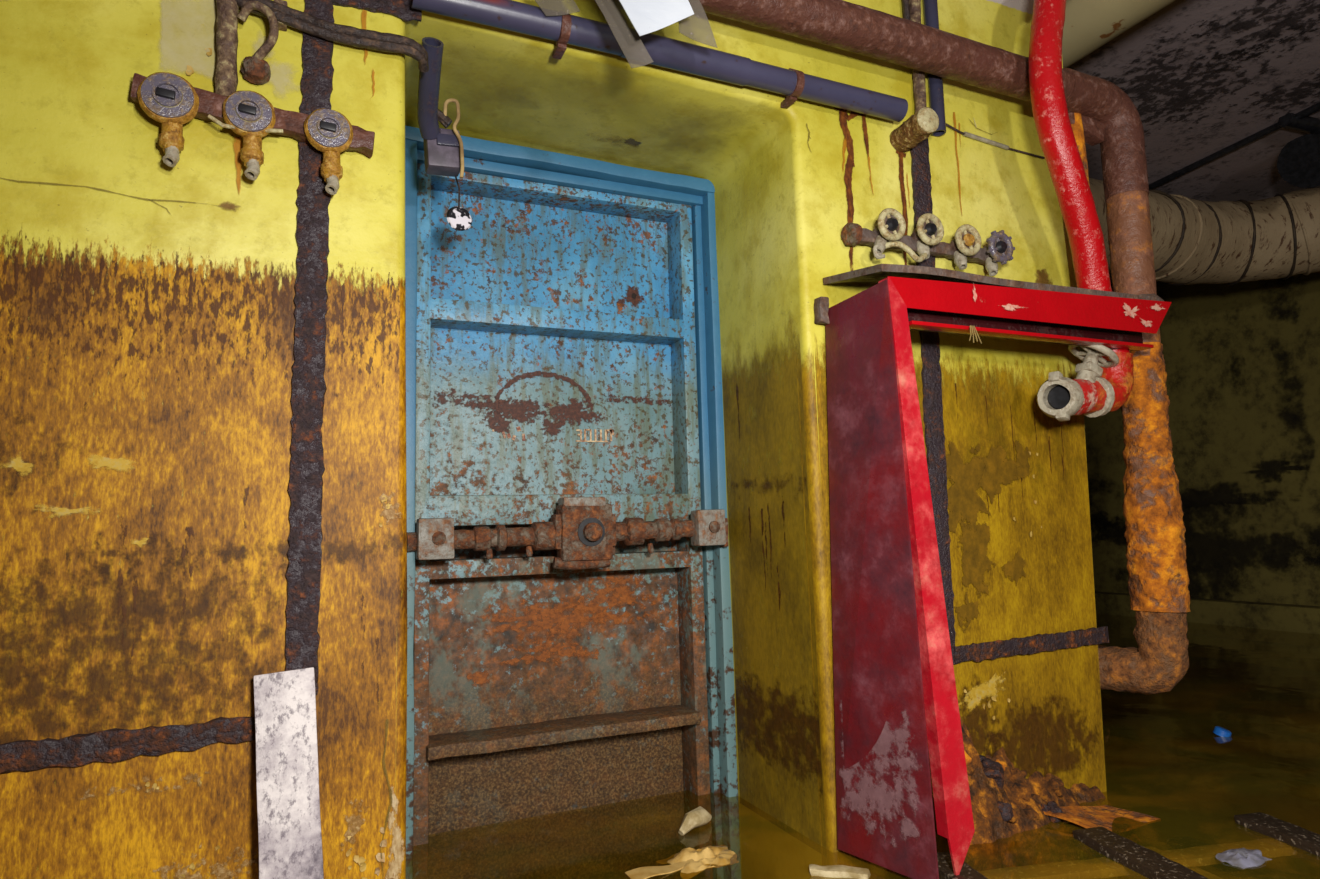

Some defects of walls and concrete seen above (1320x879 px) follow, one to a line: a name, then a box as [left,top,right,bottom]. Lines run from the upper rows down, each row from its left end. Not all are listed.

water stain [1093,0,1320,147]
crack [1,178,216,213]
corrosion [834,107,874,223]
water stain [0,235,296,744]
water stain [914,363,927,460]
water stain [1180,342,1320,600]
water stain [316,264,407,879]
water stain [940,357,1127,799]
peeling [958,672,1010,720]
water stain [0,740,259,879]
water stain [931,787,950,853]